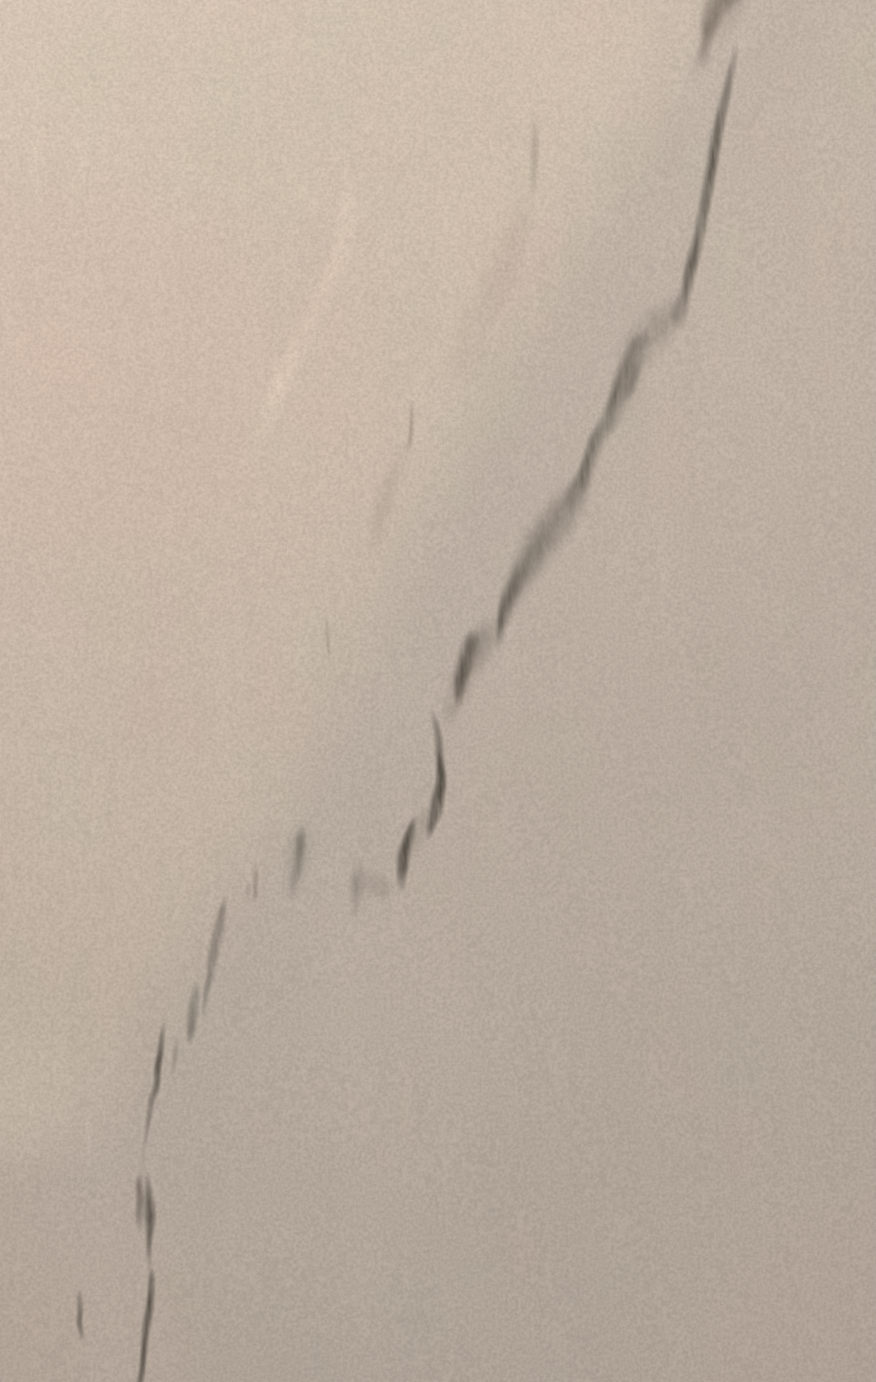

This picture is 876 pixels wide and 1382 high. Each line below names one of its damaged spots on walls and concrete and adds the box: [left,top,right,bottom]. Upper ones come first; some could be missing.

crack [685,125,720,288]
crack [459,648,469,685]
crack [400,754,444,872]
crack [154,1052,162,1084]
crack [146,1202,154,1236]
crack [141,1292,151,1378]